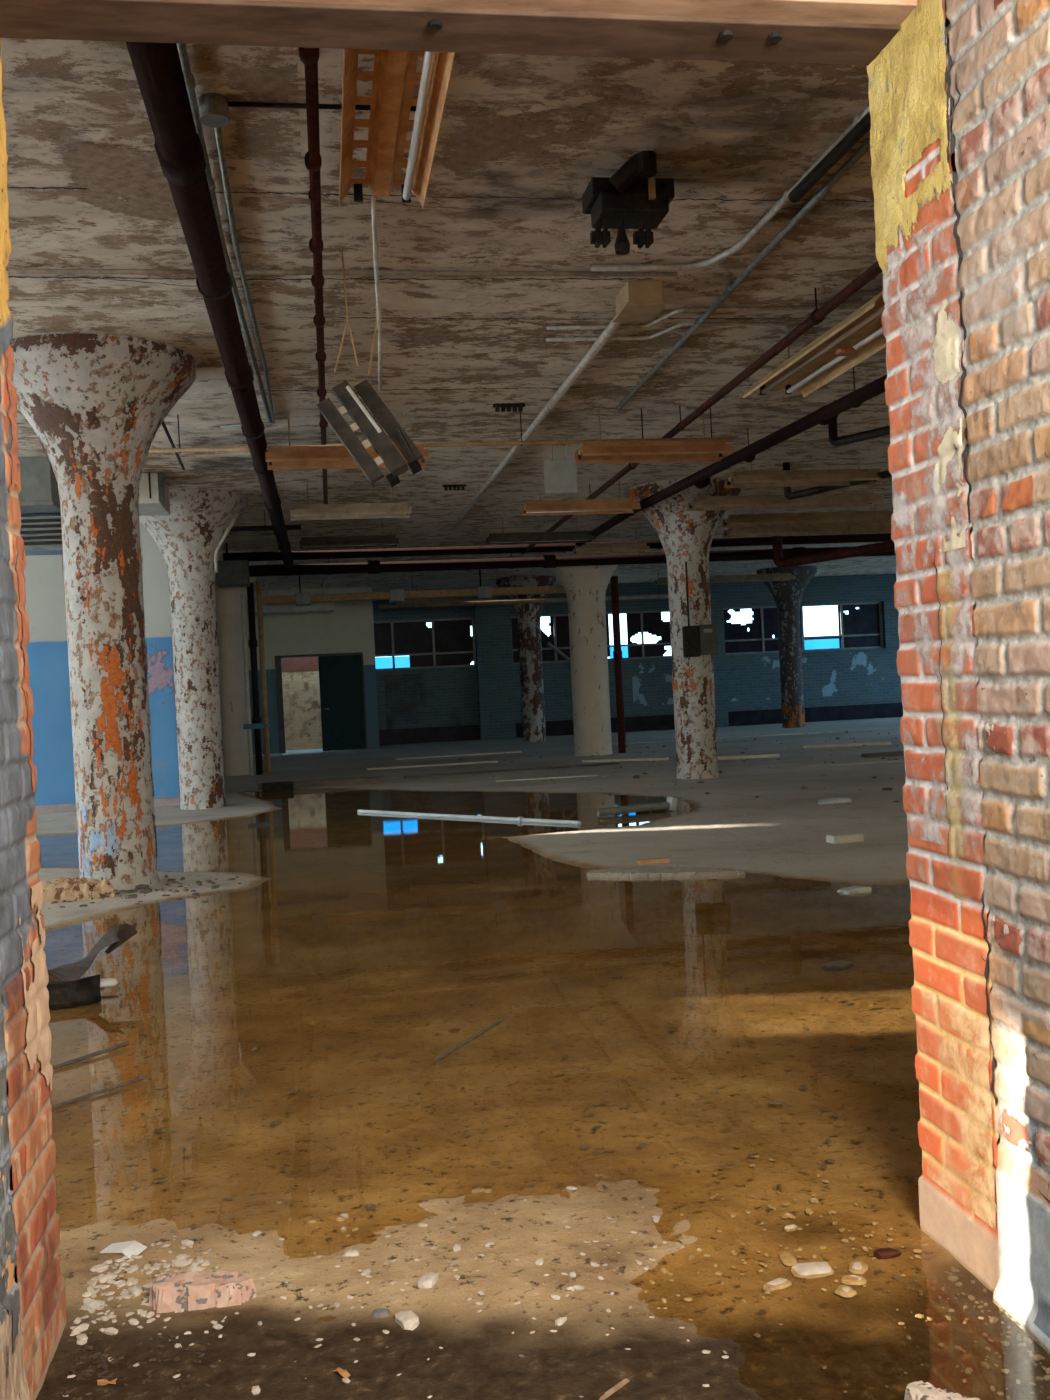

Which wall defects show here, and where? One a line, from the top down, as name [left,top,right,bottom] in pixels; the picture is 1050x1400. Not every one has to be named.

peeling [6,60,186,246]
peeling [220,53,301,159]
peeling [440,71,624,181]
peeling [353,278,580,386]
peeling [867,0,1033,708]
crack [933,25,972,859]
peeling [5,293,247,879]
peeling [496,571,562,740]
peeling [632,654,718,779]
peeling [629,479,741,637]
peeling [822,652,884,696]
peeling [910,721,1013,846]